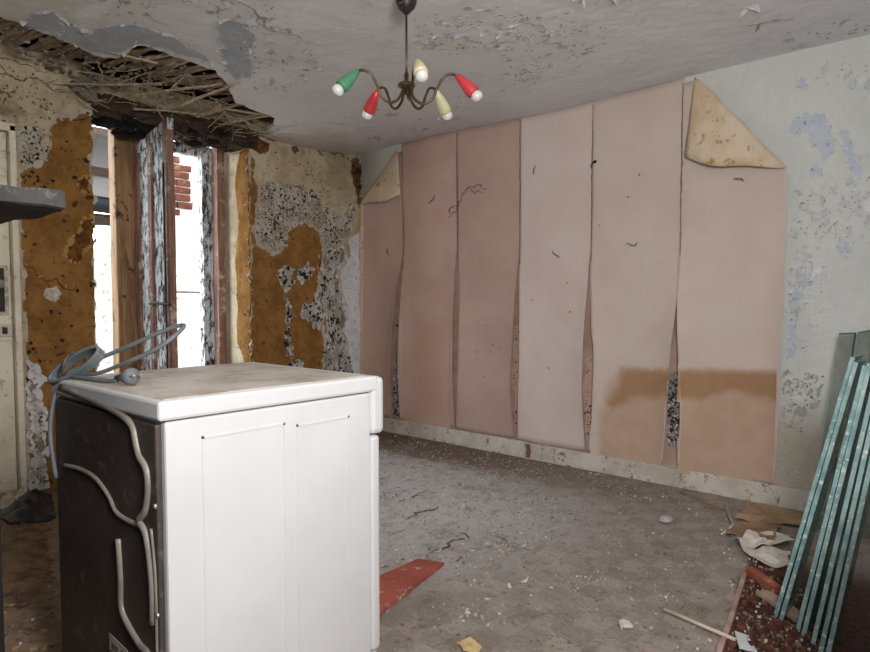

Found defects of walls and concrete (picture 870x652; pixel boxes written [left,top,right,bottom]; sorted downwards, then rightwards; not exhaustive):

peeling [20,0,323,91]
crack [223,0,301,50]
peeling [414,6,607,92]
peeling [786,112,855,178]
spalling [16,103,100,491]
spalling [235,137,362,374]
peeling [781,176,870,445]
leakage [582,356,777,483]